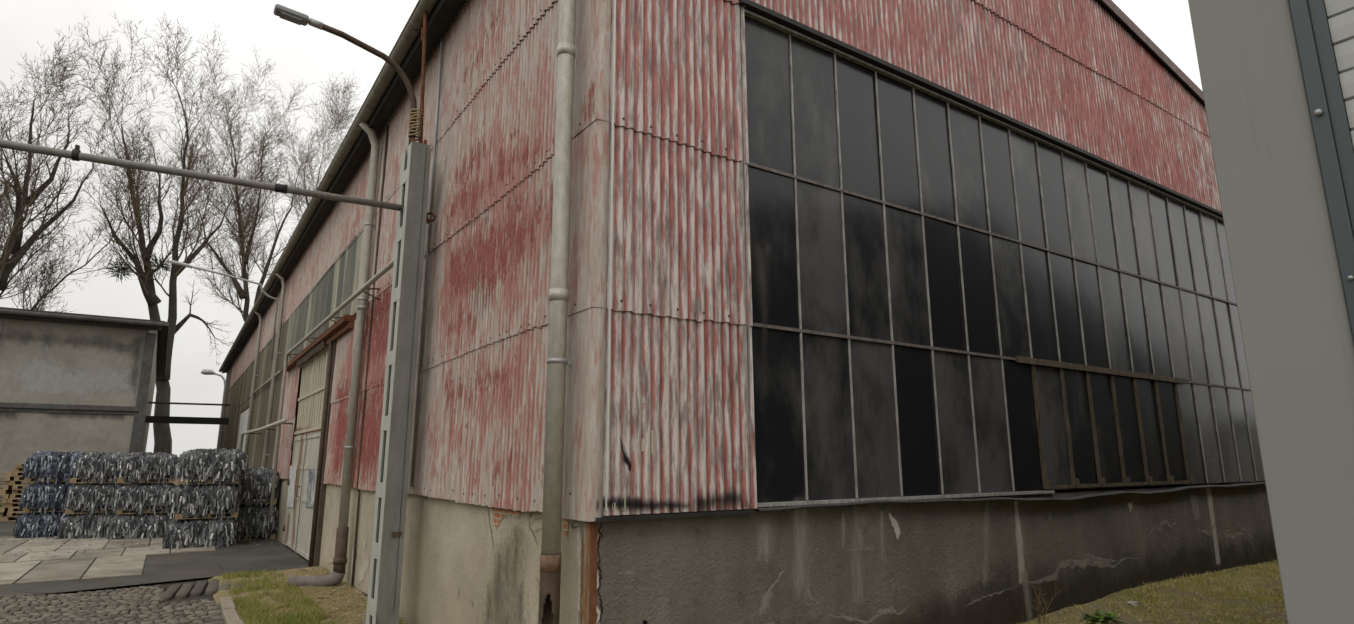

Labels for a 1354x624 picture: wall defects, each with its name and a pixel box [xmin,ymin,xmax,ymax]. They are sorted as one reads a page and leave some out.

spalling [491,509,523,529]
water stain [917,488,1277,624]